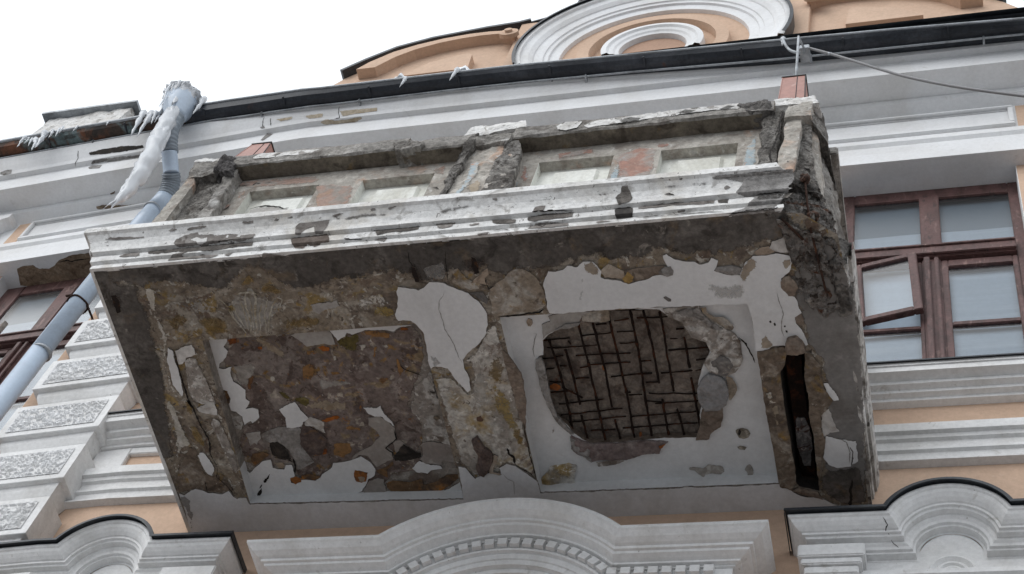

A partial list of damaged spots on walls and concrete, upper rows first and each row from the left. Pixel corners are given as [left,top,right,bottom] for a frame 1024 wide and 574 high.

peeling [306,108,377,125]
peeling [557,103,739,130]
spalling [88,145,144,169]
peeling [120,221,255,266]
flaking render [17,253,91,286]
peeling [167,132,858,532]